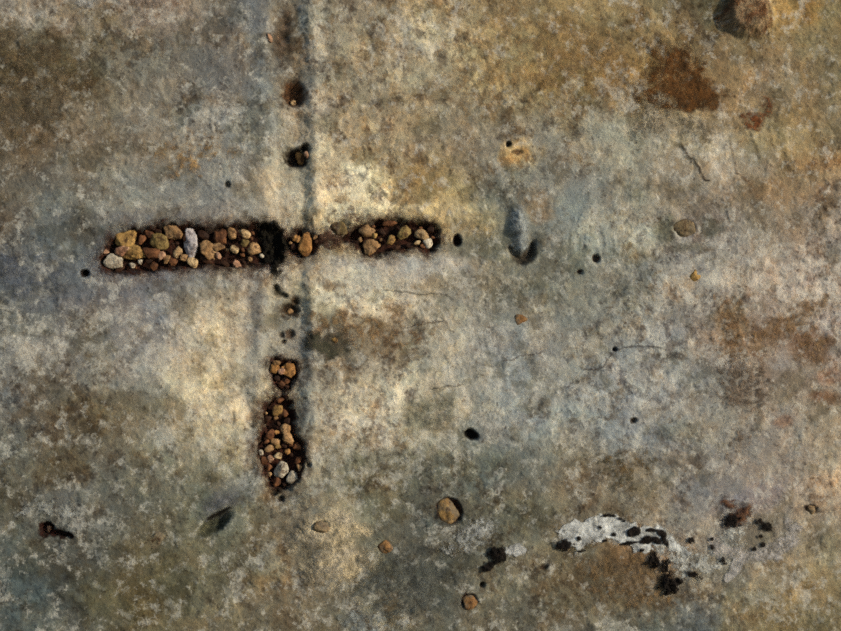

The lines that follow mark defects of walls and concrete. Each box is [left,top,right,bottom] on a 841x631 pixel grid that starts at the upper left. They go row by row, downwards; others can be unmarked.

corrosion [634,47,727,113]
spalling [99,219,324,318]
spalling [334,216,441,259]
spalling [251,356,309,501]
peeling [406,398,456,430]
efflorescence [556,513,803,582]